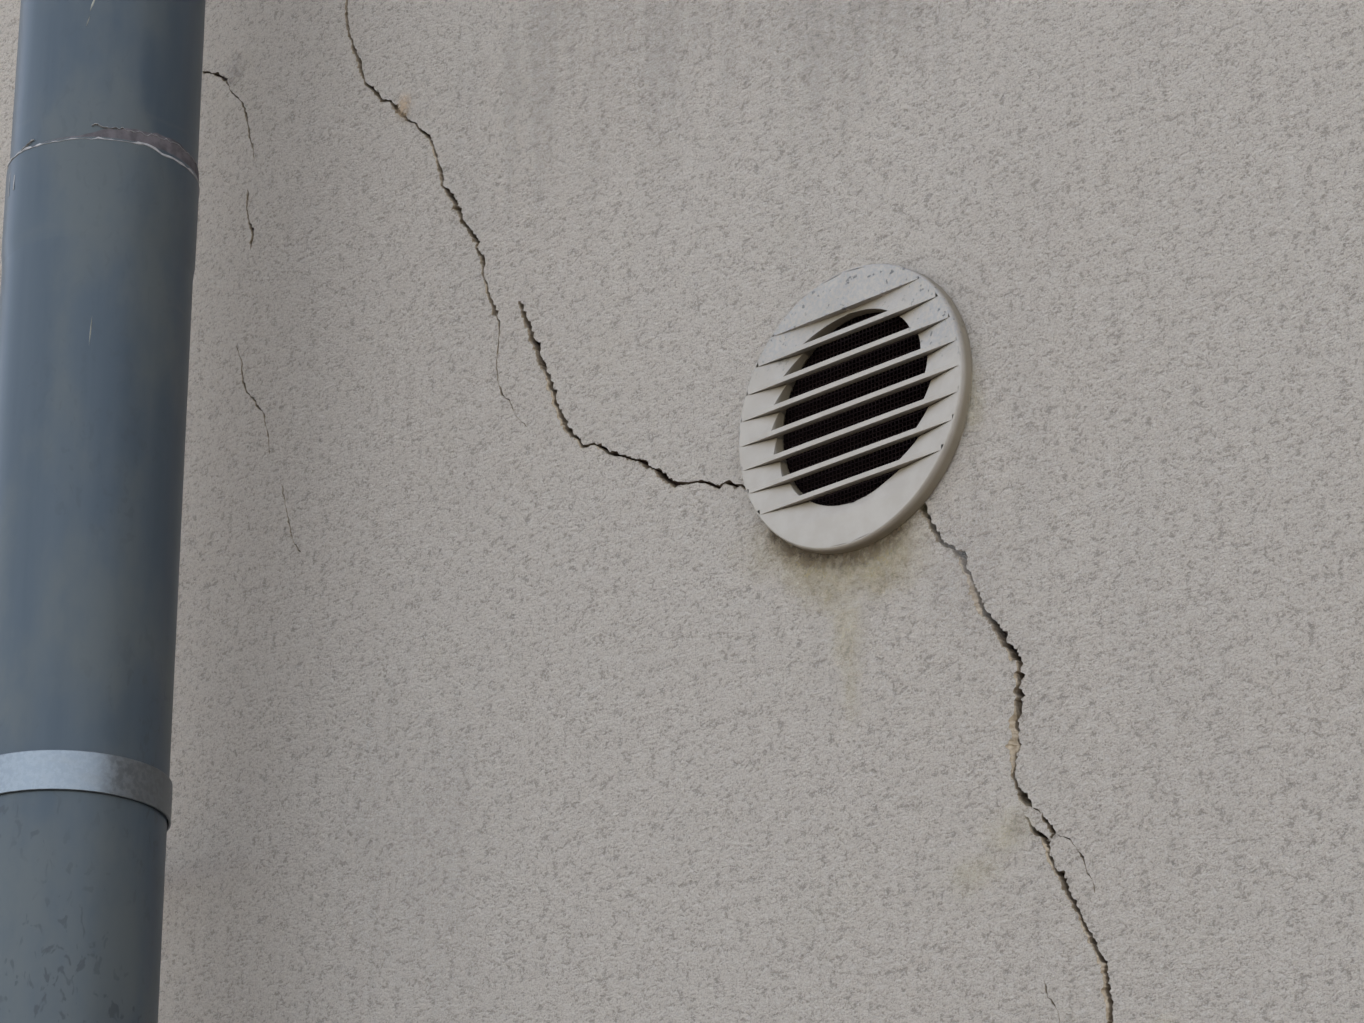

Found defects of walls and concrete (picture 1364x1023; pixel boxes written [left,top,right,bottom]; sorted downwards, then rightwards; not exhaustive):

crack [344,0,746,491]
crack [918,502,1115,1023]